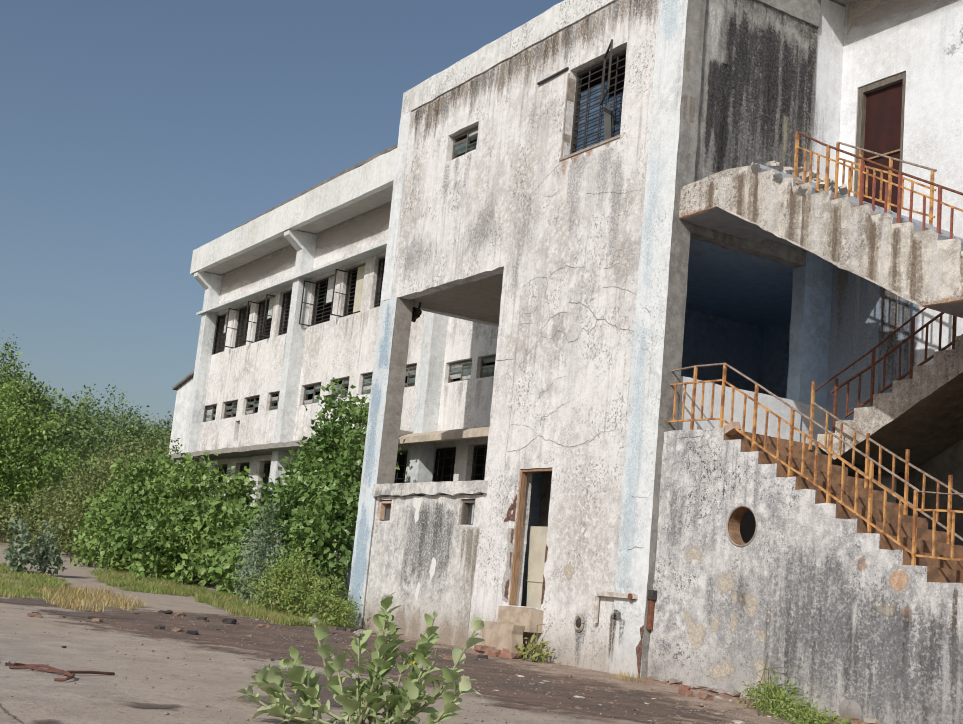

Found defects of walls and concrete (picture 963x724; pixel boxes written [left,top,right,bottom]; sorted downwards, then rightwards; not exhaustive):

damp [411,0,659,139]
damp [698,0,954,376]
crack [497,263,651,494]
damp [401,504,454,582]
damp [461,529,479,570]
flaking render [501,495,517,602]
corrosion [636,625,644,678]
damp [706,555,963,724]